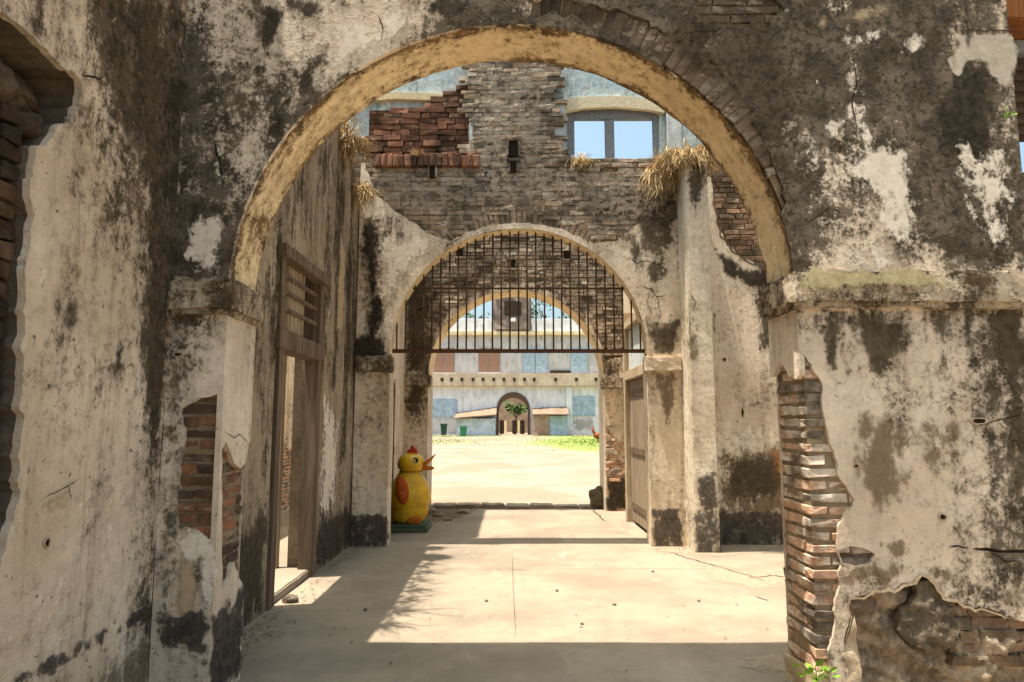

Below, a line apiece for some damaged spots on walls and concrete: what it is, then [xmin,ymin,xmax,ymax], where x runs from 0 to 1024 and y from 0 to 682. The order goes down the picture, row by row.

crack [213,138,228,189]
water stain [264,55,328,147]
crack [850,50,858,139]
water stain [935,66,995,165]
flaking render [0,57,43,379]
water stain [111,0,179,480]
crack [626,258,703,321]
water stain [103,343,124,376]
flaking render [15,395,246,682]
water stain [658,442,784,588]
flaking render [719,358,1024,682]
crack [950,545,1024,562]